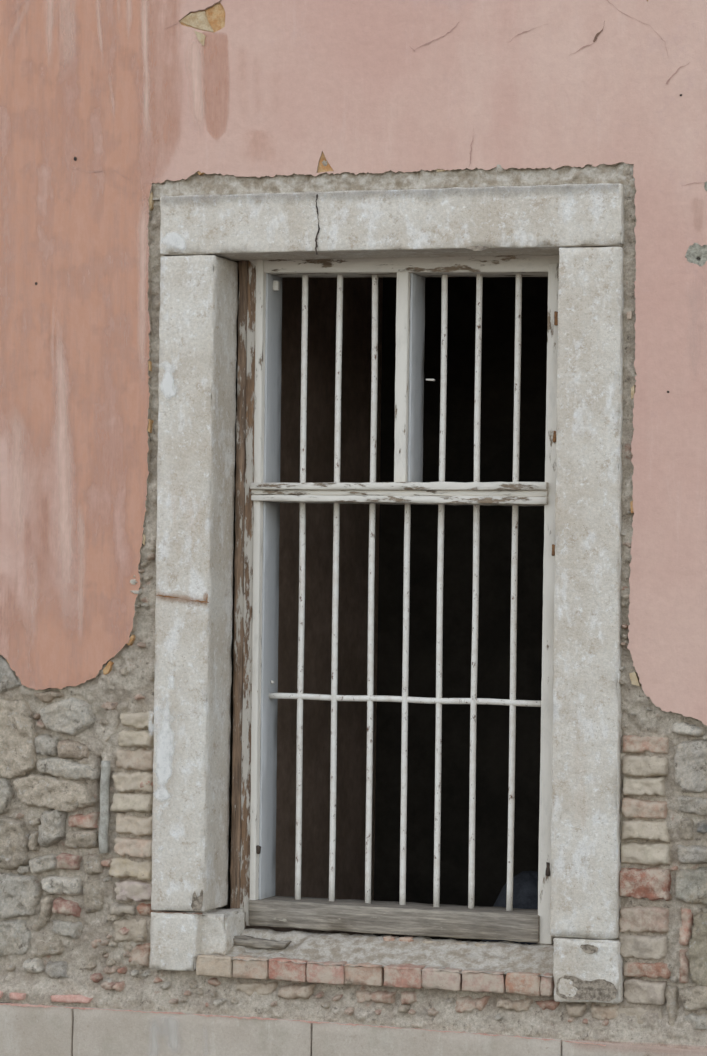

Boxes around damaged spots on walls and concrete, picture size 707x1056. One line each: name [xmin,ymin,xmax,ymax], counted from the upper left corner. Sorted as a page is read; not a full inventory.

spalling [167,0,225,46]
crack [570,0,690,84]
spalling [317,152,334,173]
crack [313,194,321,255]
damp [0,0,174,690]
spalling [0,192,621,1046]